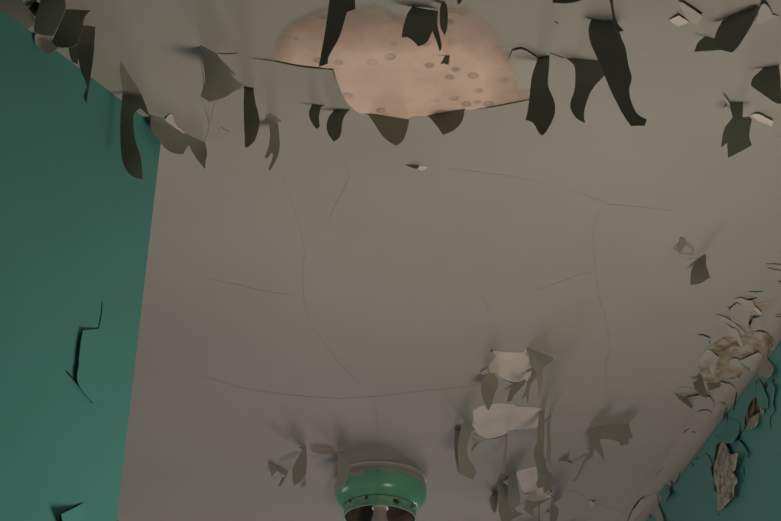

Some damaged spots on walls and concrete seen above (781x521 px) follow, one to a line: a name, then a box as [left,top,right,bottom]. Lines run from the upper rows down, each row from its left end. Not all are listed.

peeling [0,0,95,104]
peeling [669,1,703,27]
peeling [694,3,779,53]
peeling [120,0,647,180]
peeling [751,66,781,104]
peeling [721,95,773,158]
peeling [670,237,710,285]
peeling [674,291,775,515]
peeling [268,444,350,490]
peeling [454,347,571,521]
peeling [573,424,633,482]
peeling [60,503,86,521]